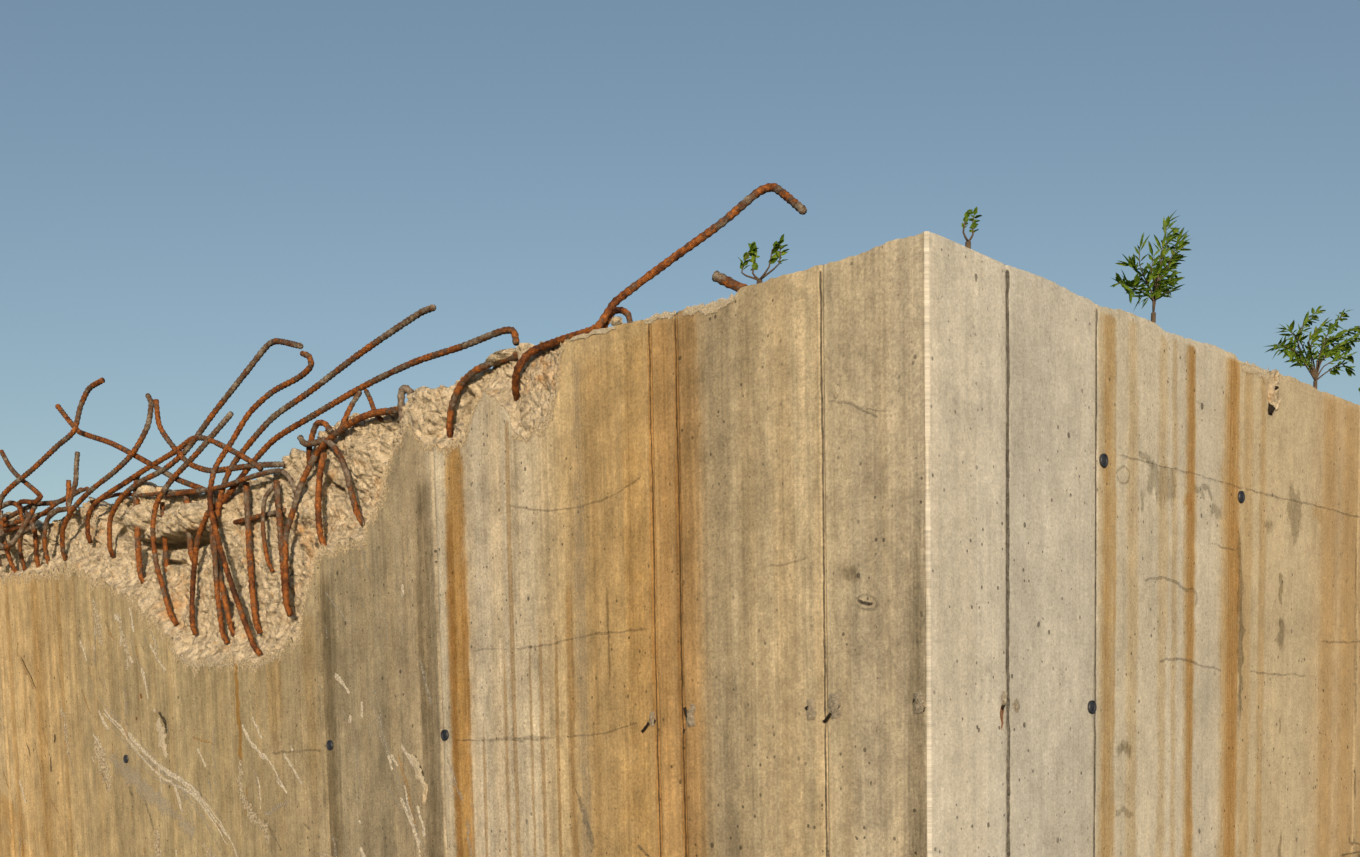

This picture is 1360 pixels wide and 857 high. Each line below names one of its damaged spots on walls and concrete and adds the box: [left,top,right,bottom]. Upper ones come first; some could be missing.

spalling [0,183,807,677]